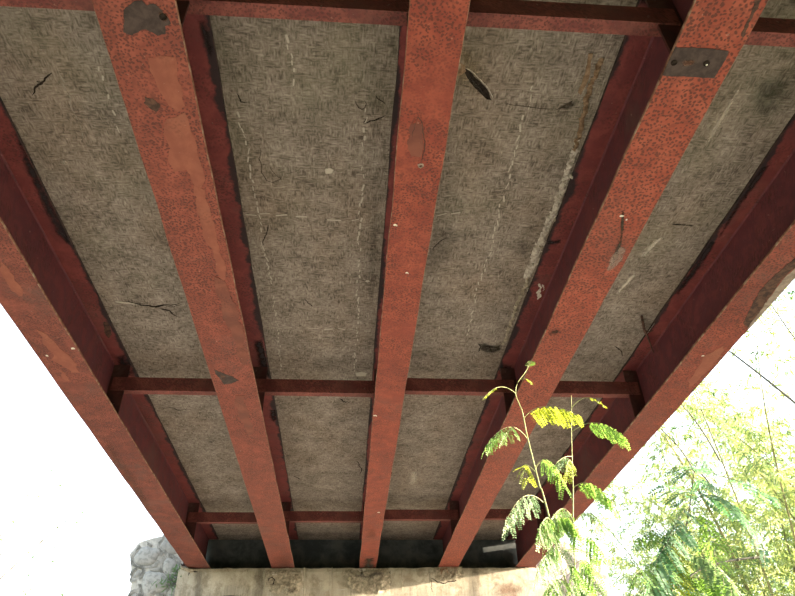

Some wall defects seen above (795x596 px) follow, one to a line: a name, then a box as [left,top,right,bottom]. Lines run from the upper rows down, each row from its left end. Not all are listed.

peeling [123,0,171,36]
crack [32,73,52,95]
peeling [144,56,226,281]
crack [126,301,179,316]
spalling [265,570,302,595]
spalling [343,568,391,594]